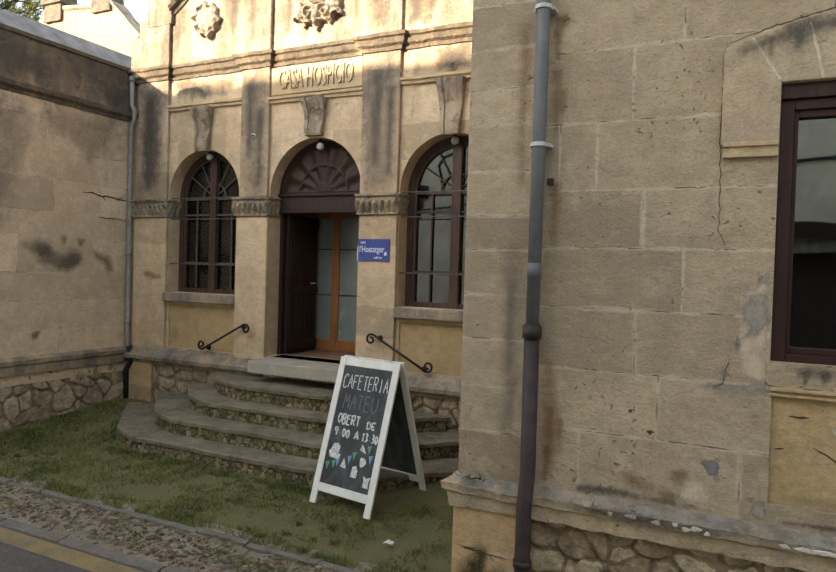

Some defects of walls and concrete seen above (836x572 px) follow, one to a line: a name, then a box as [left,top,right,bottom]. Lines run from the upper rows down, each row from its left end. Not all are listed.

water stain [142,88,161,189]
crack [717,6,836,252]
water stain [32,244,79,268]
crack [84,192,126,221]
flaking render [721,272,770,382]
spalling [779,544,836,558]